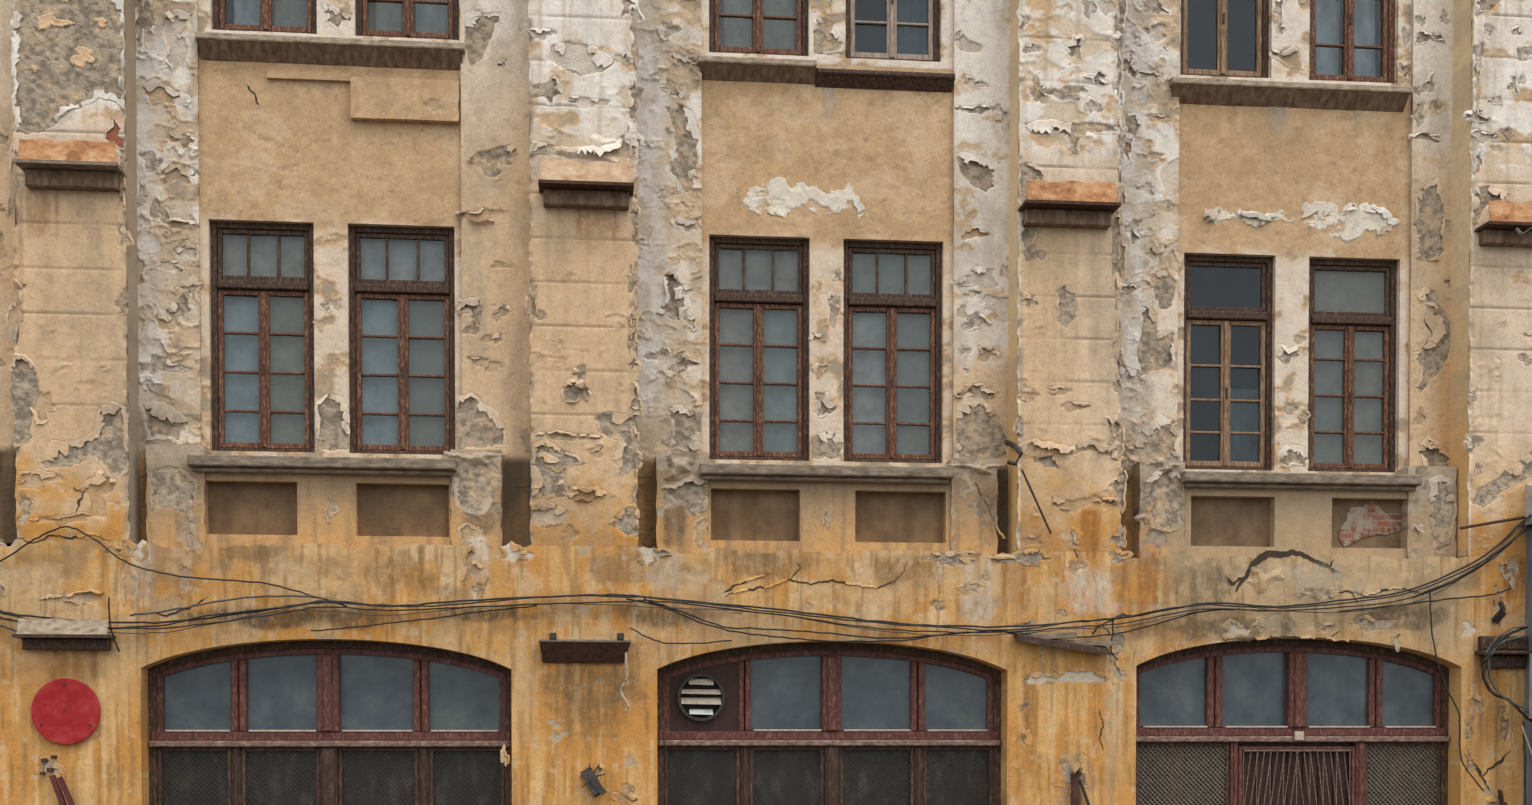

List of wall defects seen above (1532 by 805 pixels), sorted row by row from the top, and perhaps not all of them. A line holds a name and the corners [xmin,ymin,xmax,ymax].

spalling [0,0,202,331]
spalling [464,10,508,68]
spalling [953,0,1176,392]
spalling [1301,178,1451,262]
peeling [1396,10,1449,143]
spalling [1463,0,1532,231]
spalling [0,278,191,526]
spalling [453,392,534,602]
crack [724,560,909,596]
spalling [921,163,1184,611]
crack [1223,549,1421,642]
spalling [1339,277,1532,551]